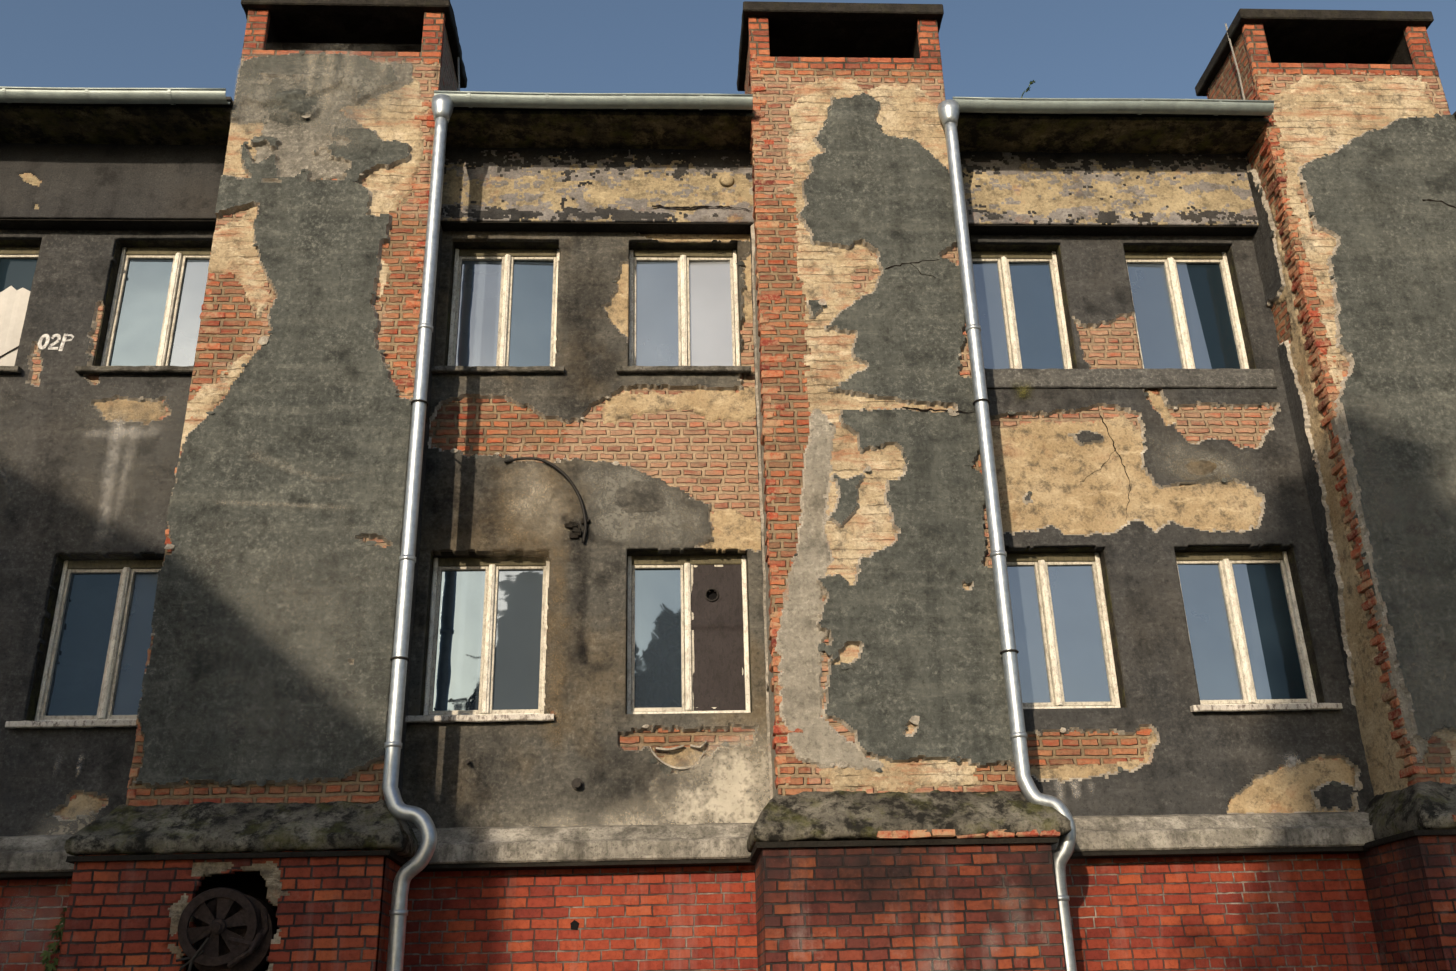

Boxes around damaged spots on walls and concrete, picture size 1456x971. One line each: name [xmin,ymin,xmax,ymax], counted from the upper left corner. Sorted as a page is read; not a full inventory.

flaking render [222,117,280,183]
flaking render [83,201,278,496]
flaking render [338,27,1456,814]
flaking render [160,521,175,570]
flaking render [46,608,385,821]
flaking render [876,829,1060,840]